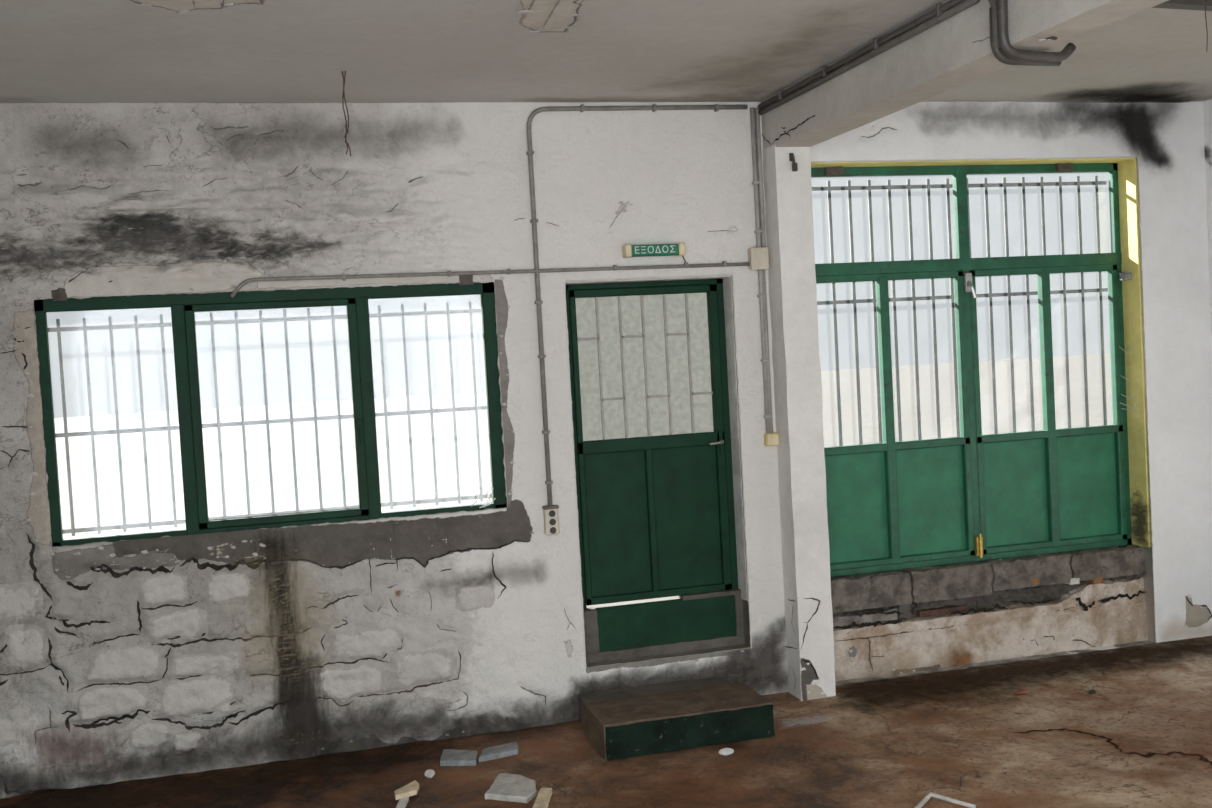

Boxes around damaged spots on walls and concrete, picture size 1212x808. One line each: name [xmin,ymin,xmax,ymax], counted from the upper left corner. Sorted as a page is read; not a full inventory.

crack [0,426,30,470]
peeling [8,277,534,591]
spalling [835,601,918,630]
spalling [949,577,1146,616]
spalling [1184,595,1212,628]
crack [0,528,403,749]
crack [317,569,468,711]
water stain [0,538,789,808]
crack [1013,728,1212,766]